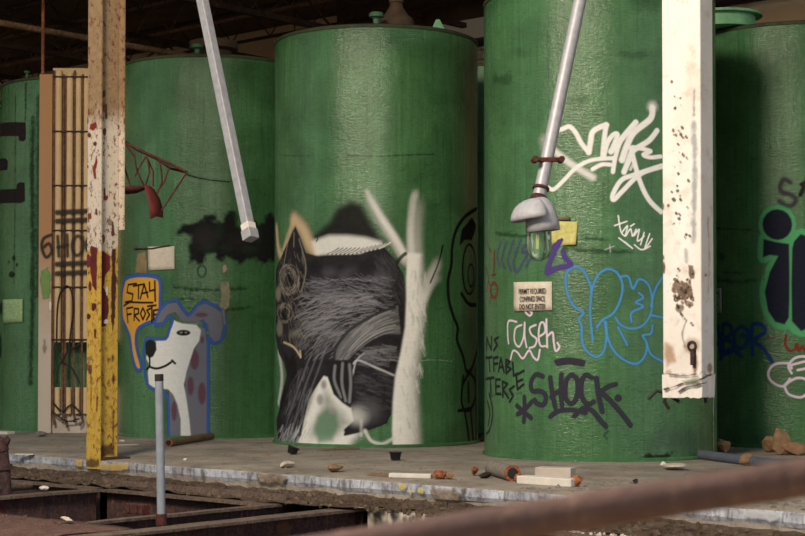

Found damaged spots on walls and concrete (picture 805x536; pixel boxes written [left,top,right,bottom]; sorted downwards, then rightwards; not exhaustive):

peeling [87,90,107,146]
peeling [87,219,116,338]
spalling [672,265,694,324]
rust [86,410,114,467]
spalling [398,484,461,501]